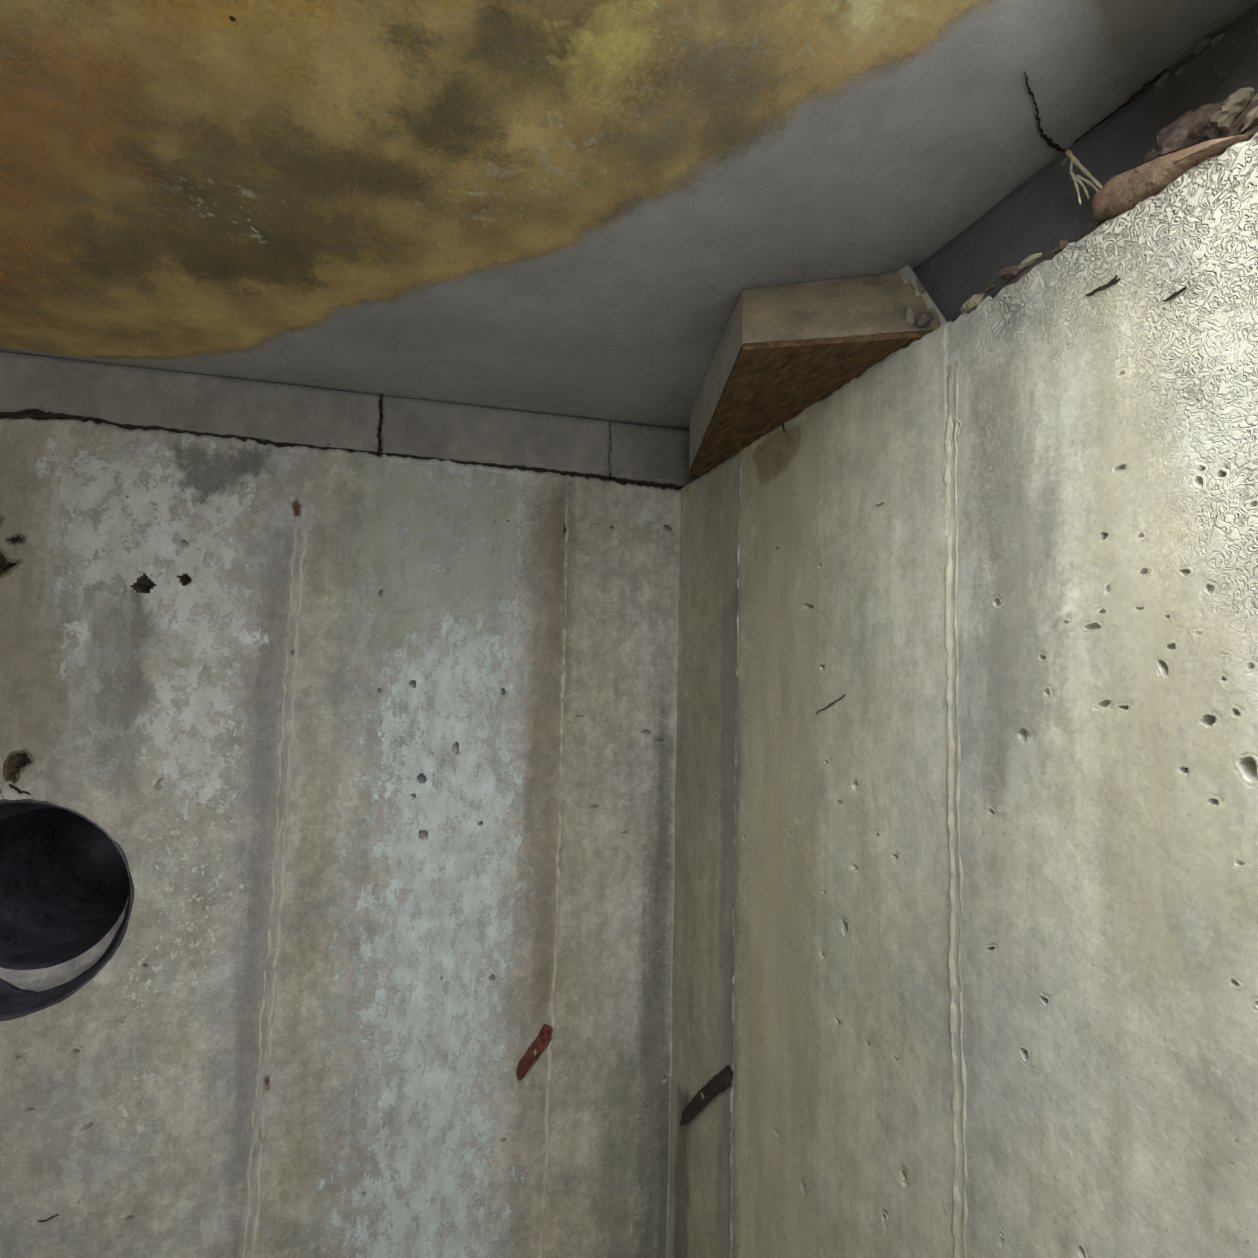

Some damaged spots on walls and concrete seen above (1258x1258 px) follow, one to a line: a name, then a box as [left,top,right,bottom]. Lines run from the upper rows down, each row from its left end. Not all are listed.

crack [1024,68,1167,152]
leakage [0,0,983,358]
crack [0,394,678,490]
spalling [0,514,27,578]
rust [516,1024,553,1080]
rust [680,1065,733,1125]